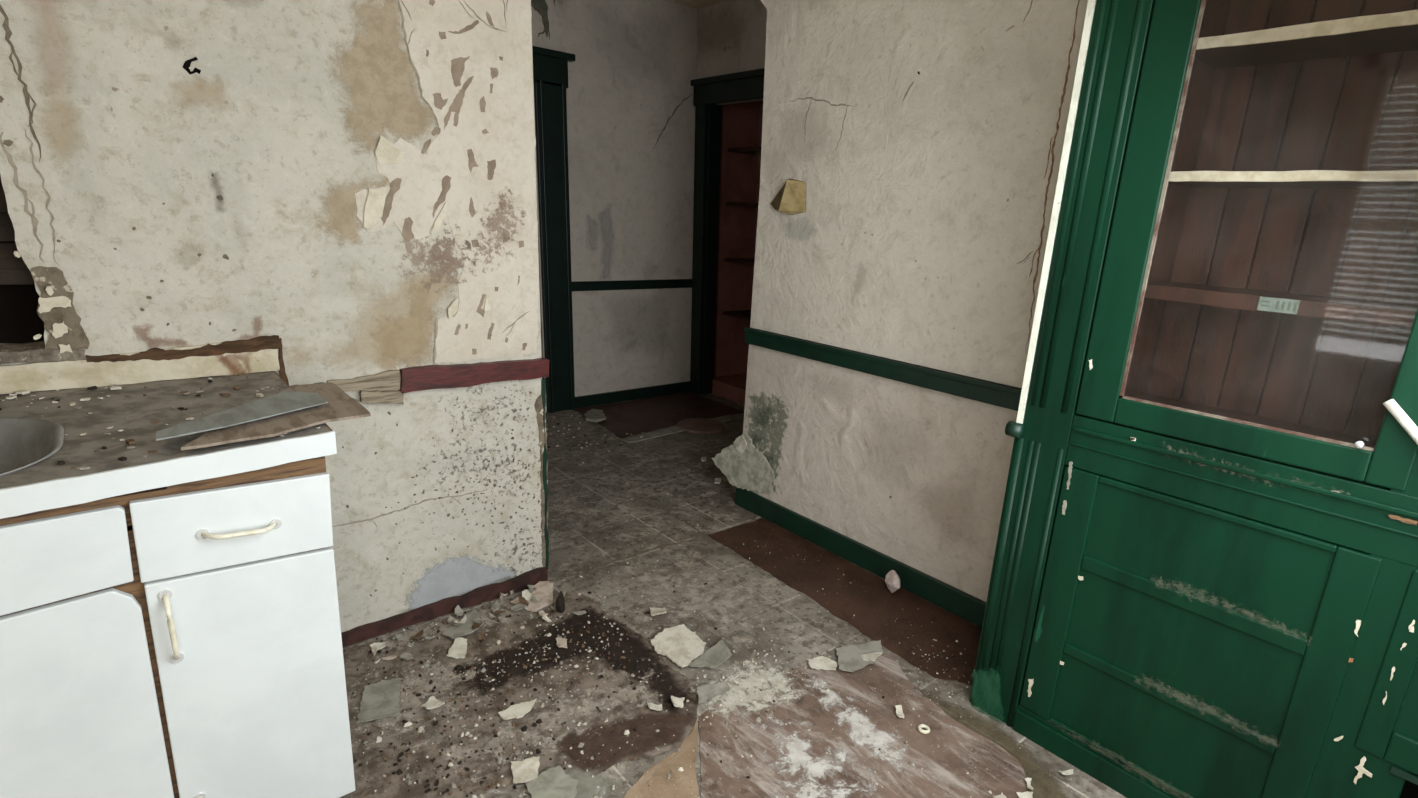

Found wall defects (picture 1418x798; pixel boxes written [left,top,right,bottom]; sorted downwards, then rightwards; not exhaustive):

crack [0,5,59,265]
water stain [323,185,360,239]
water stain [335,0,435,150]
peeling [355,0,549,363]
crack [791,97,857,148]
flaking render [14,251,90,353]
water stain [343,381,919,798]